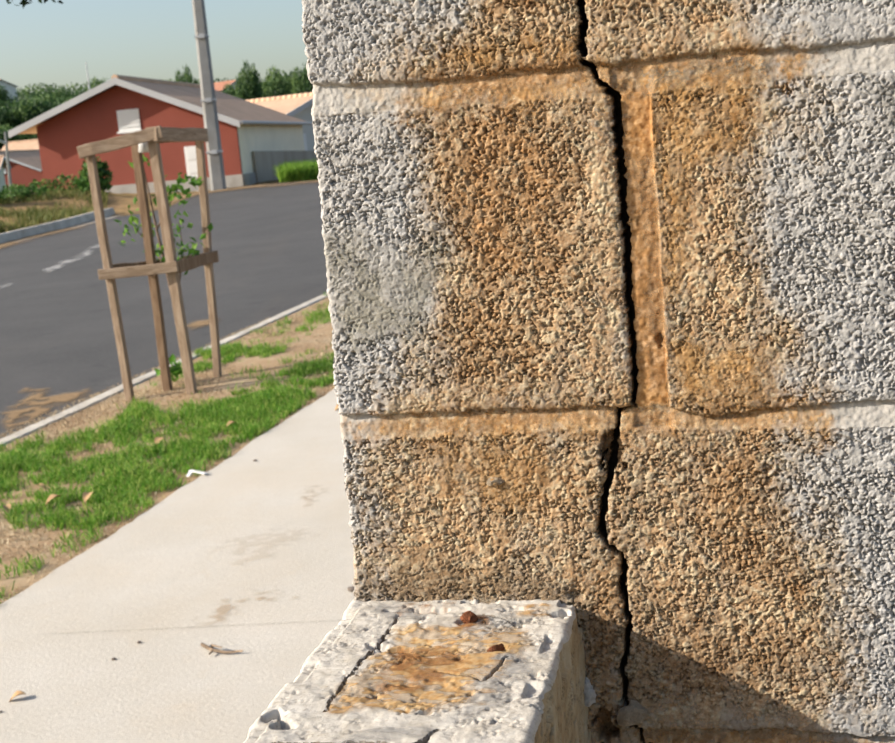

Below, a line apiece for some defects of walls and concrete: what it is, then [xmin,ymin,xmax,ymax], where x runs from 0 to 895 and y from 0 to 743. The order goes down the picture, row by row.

corrosion [330,0,847,743]
crack [576,0,653,743]